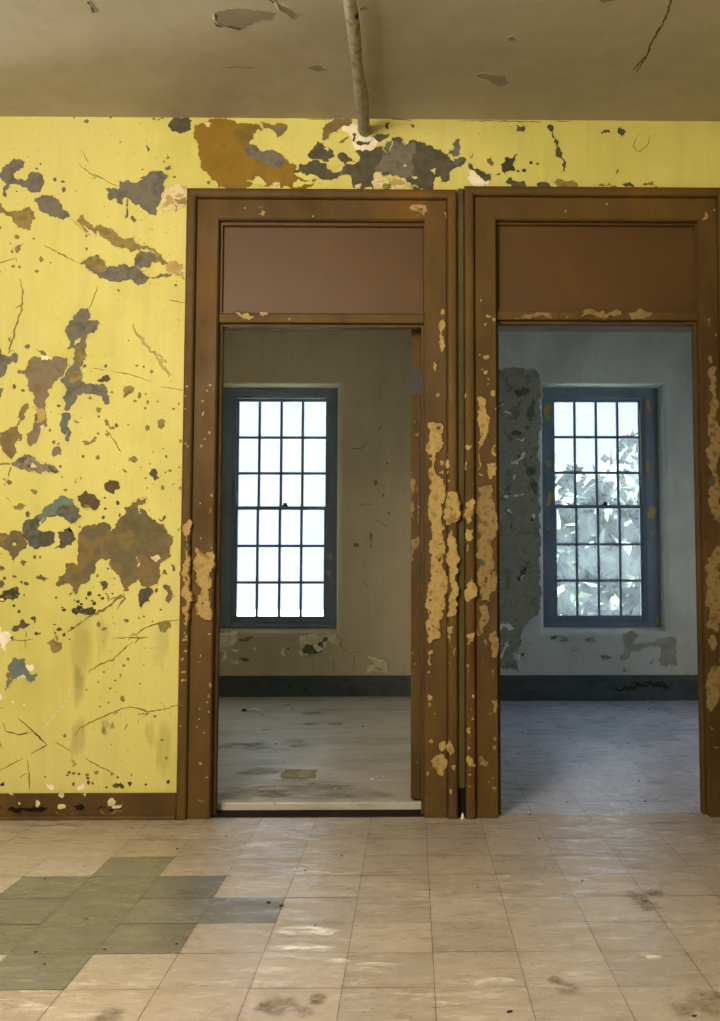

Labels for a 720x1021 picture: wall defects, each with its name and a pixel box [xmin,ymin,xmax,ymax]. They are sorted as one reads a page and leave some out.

crack [633,0,672,72]
peeling [152,117,578,190]
peeling [0,154,188,292]
peeling [704,356,720,524]
peeling [0,308,256,681]
peeling [410,354,553,677]
peeling [705,546,720,651]
peeling [0,610,74,710]
peeling [705,665,720,712]
spalling [0,759,98,815]
crack [0,703,178,790]
peeling [98,798,122,815]